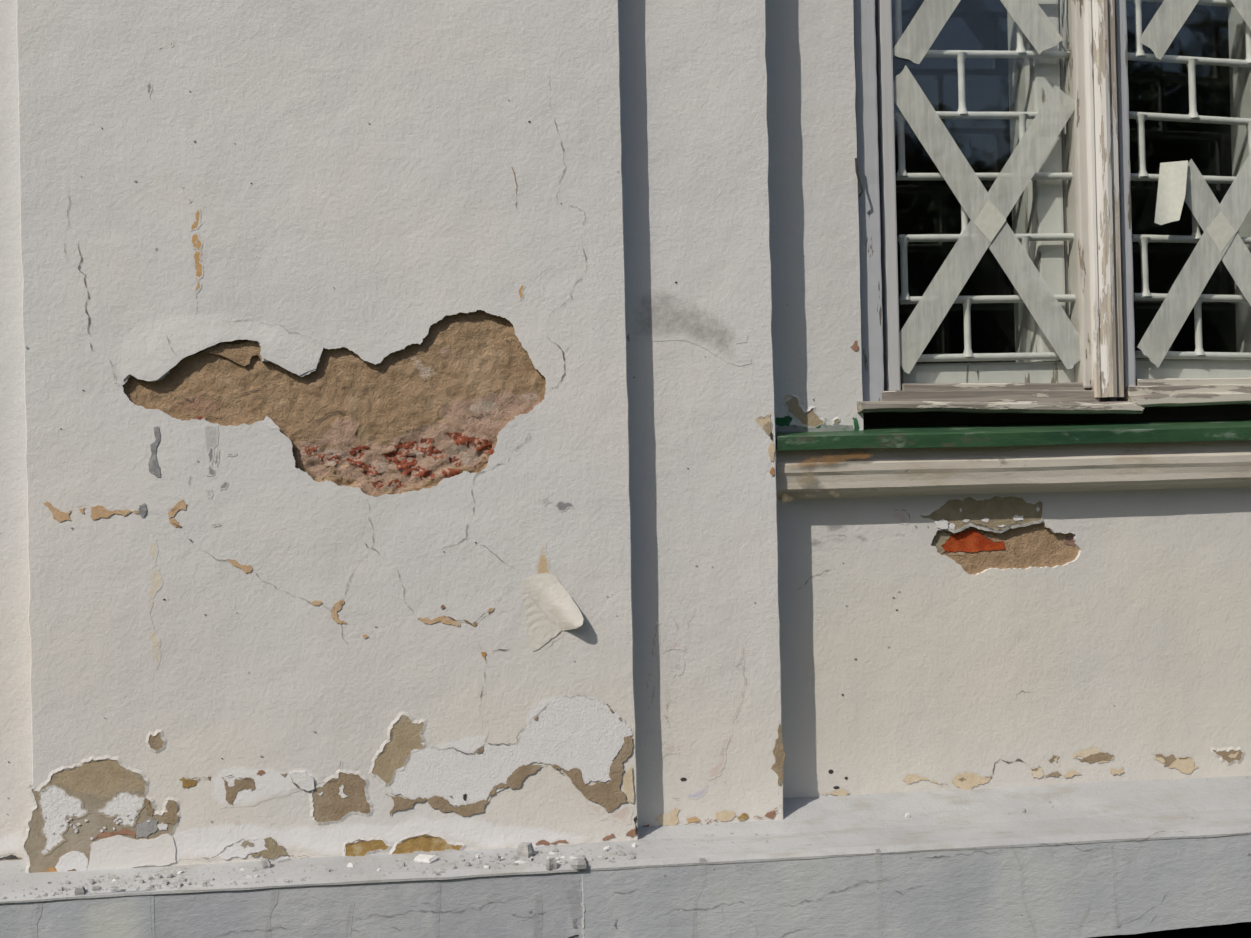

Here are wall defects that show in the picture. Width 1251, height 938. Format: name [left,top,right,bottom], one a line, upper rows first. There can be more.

flaking render [123,310,546,497]
flaking render [891,494,1079,575]
peeling [145,729,167,754]
peeling [281,693,781,840]
peeling [903,772,992,790]
peeling [1031,747,1124,779]
peeling [1155,754,1198,774]
peeling [1211,746,1246,766]
peeling [0,755,309,873]
peeling [342,831,467,864]
flaking render [568,903,585,938]